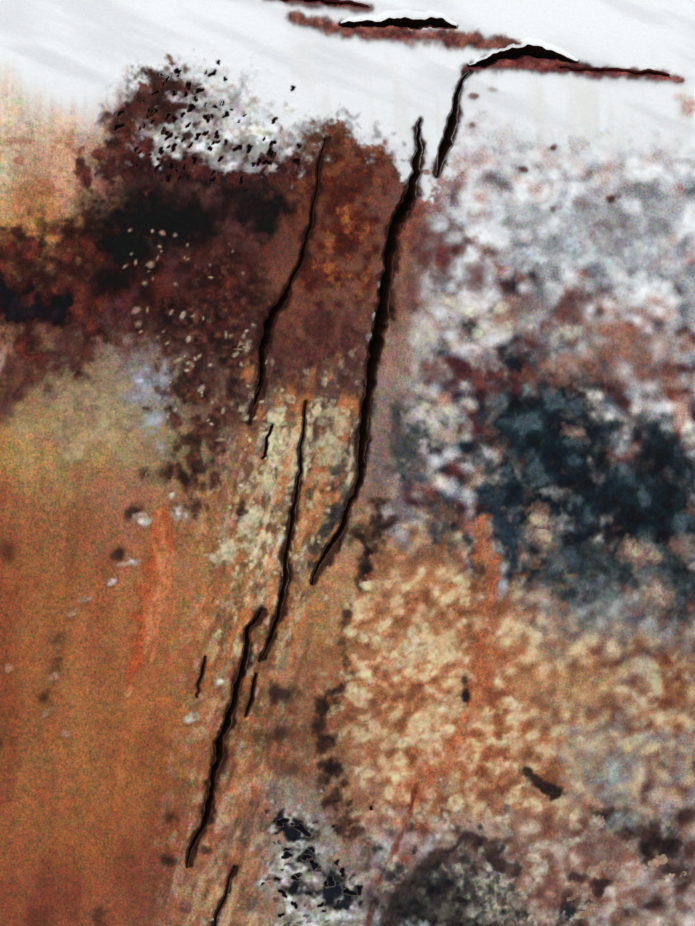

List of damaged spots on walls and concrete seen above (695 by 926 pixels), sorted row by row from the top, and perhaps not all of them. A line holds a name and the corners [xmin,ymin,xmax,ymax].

spalling [74,59,316,198]
corrosion [0,209,272,518]
crack [185,71,474,868]
water stain [391,401,457,482]
corrosion [421,357,536,393]
water stain [458,349,695,620]
spalling [255,498,594,926]
corrosion [365,515,501,926]
crack [211,865,238,926]
water stain [559,872,612,926]
spalling [504,832,668,926]
water stain [596,807,695,889]